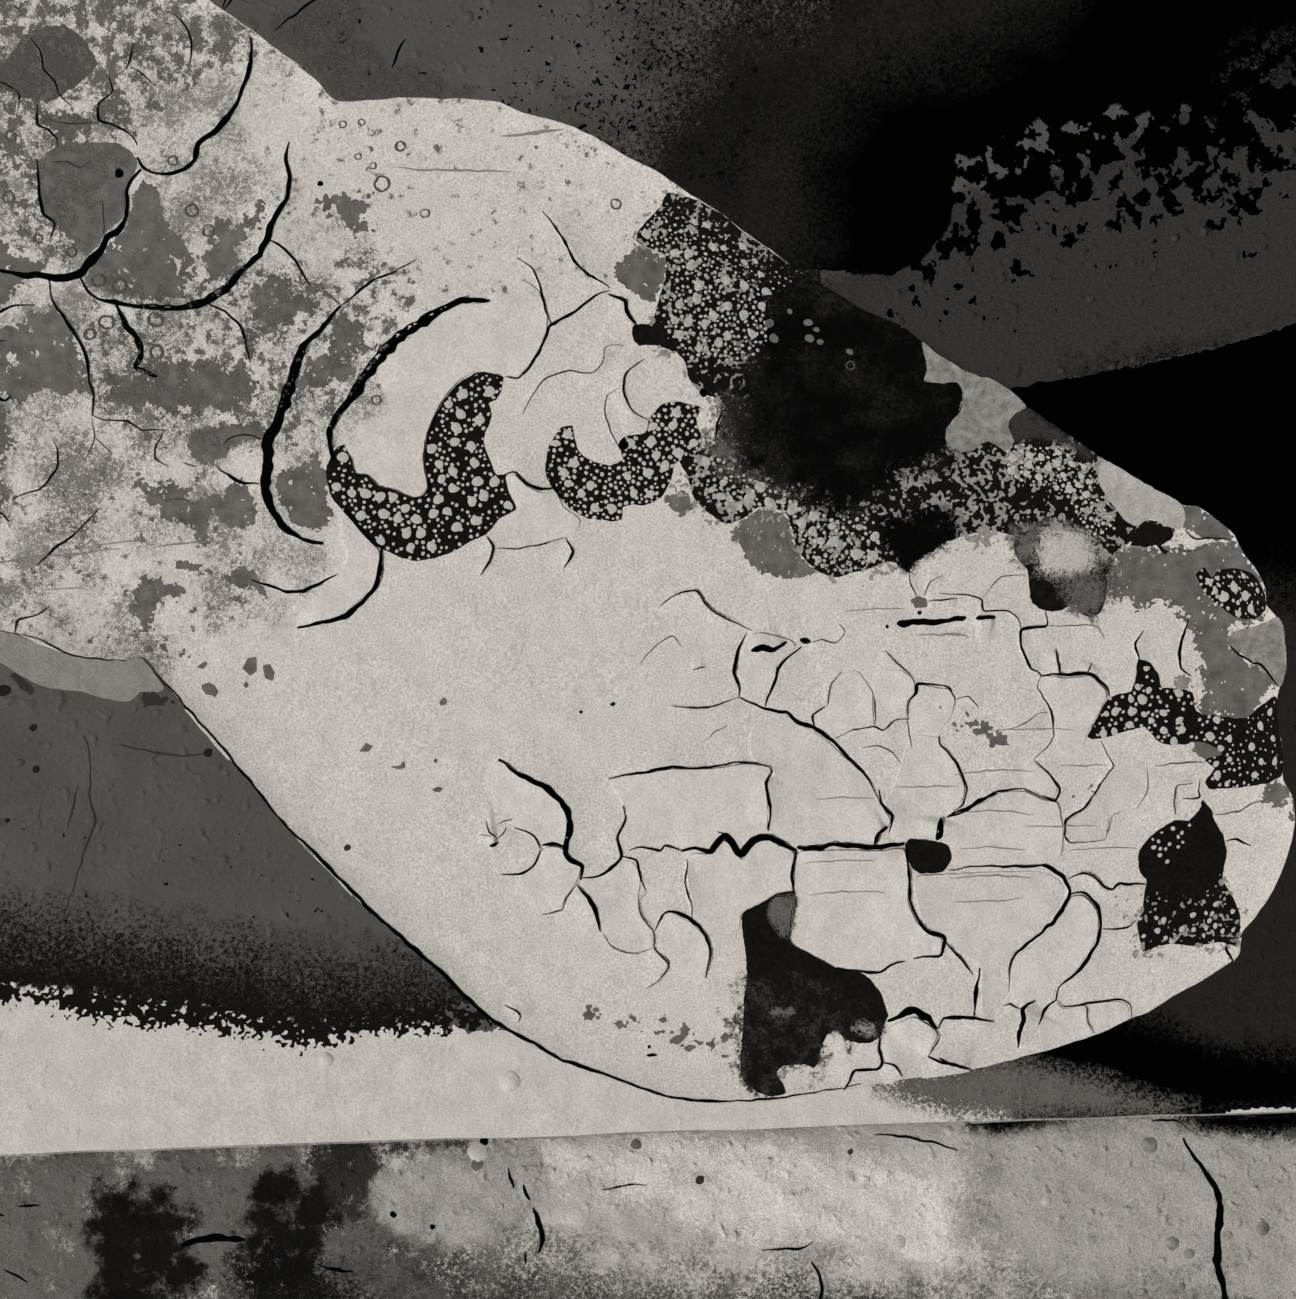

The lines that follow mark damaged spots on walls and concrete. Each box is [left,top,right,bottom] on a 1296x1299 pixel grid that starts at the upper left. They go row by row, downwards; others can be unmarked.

peeling [0,631,164,701]
crack [0,0,415,545]
crack [252,546,383,629]
crack [326,297,489,461]
crack [505,211,648,451]
peeling [294,185,1186,625]
peeling [485,633,1146,1100]
crack [479,575,1269,1090]
leakage [648,0,1296,1299]
peeling [1040,568,1286,960]
leakage [0,1140,996,1299]
crack [1152,1119,1228,1299]